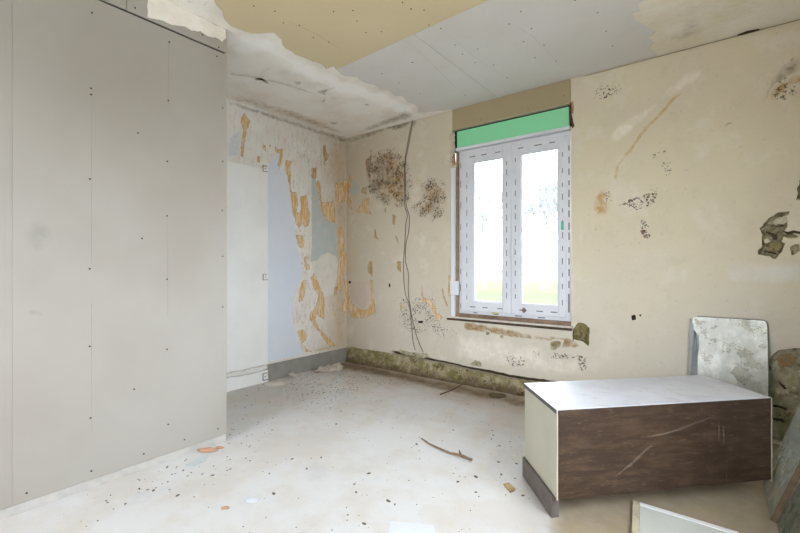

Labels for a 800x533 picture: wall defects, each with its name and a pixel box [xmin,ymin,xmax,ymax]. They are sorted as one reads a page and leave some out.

peeling [631,0,800,56]
peeling [226,48,452,138]
damp [755,56,800,108]
damp [600,65,707,245]
flaking render [257,145,338,362]
damp [228,91,451,352]
corrosion [591,186,610,220]
flaking render [758,212,800,259]
damp [398,275,591,379]
flaking render [573,323,590,346]
damp [306,362,525,412]